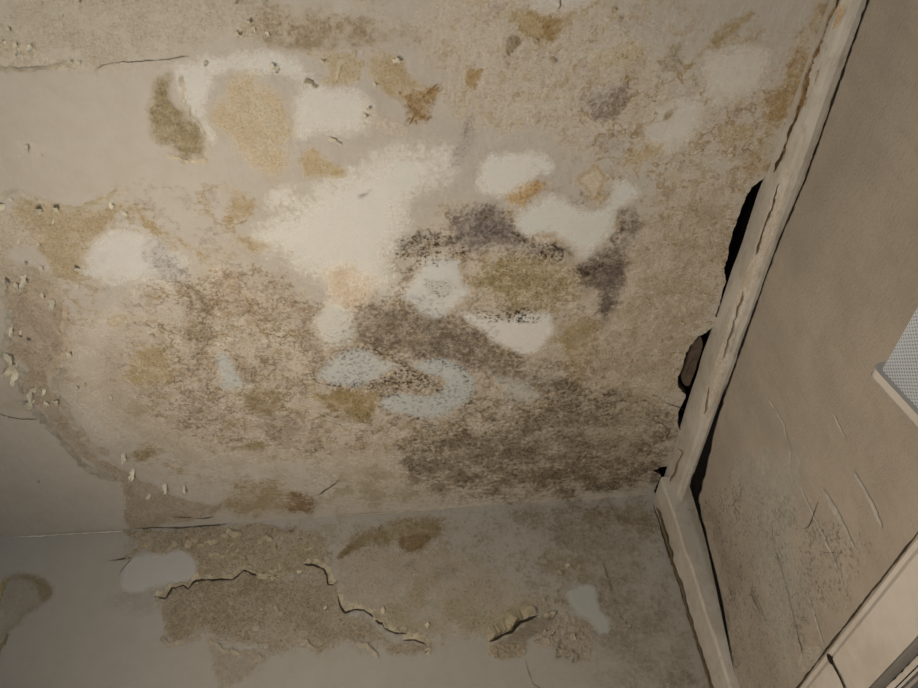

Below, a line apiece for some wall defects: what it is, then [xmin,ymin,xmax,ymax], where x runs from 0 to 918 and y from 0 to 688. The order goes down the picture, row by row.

leakage [261,17,372,48]
peeling [0,187,217,528]
leakage [319,363,442,421]
leakage [348,300,540,385]
leakage [396,54,808,494]
spalling [677,328,712,429]
peeling [723,292,743,359]
spalling [715,178,764,317]
peeling [755,184,779,255]
peeling [123,552,432,666]
crack [654,506,710,686]
crack [772,509,918,688]